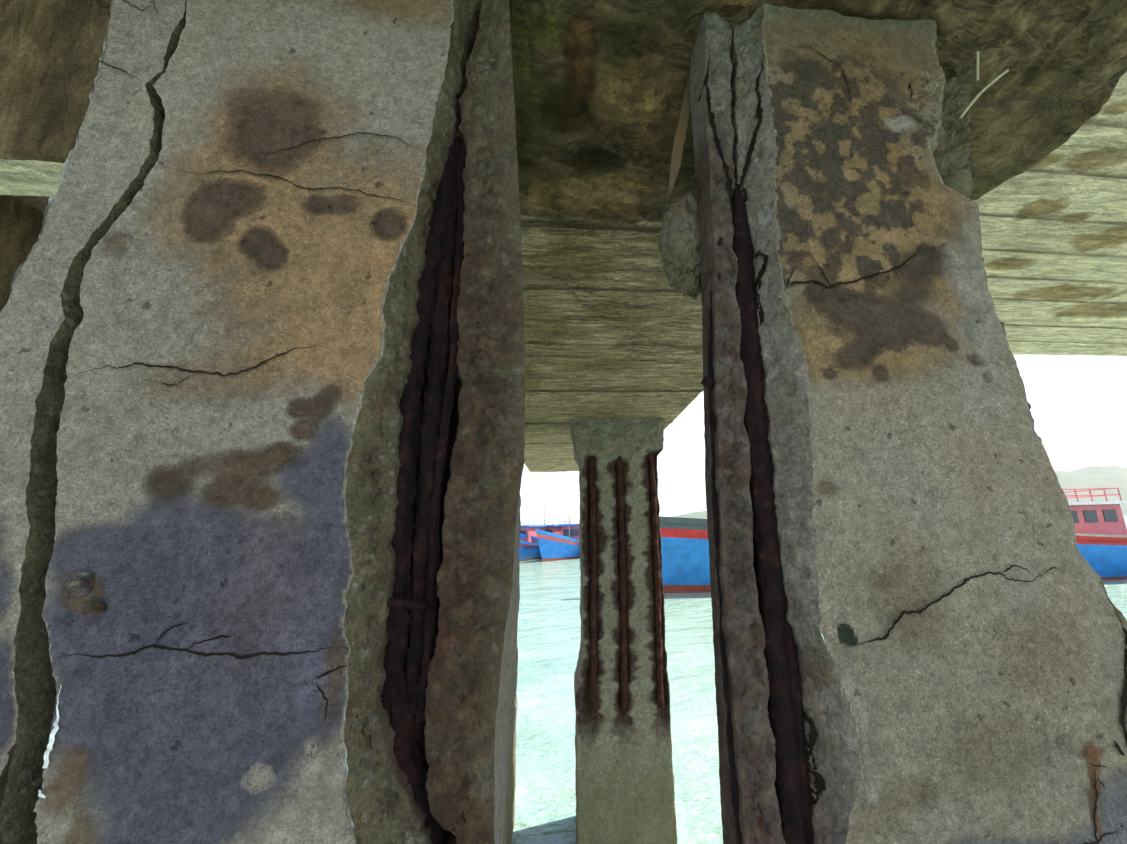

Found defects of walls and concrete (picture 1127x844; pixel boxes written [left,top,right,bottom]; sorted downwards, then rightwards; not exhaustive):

crack [698,42,851,215]
crack [753,242,925,326]
damp [769,36,1032,381]
crack [0,0,425,844]
damp [41,74,416,844]
spalling [343,0,526,844]
corrosion [588,456,598,714]
corrosion [616,456,628,712]
spalling [690,3,862,844]
crack [854,565,1062,645]
corrosion [1084,744,1102,837]
crack [1084,615,1127,844]